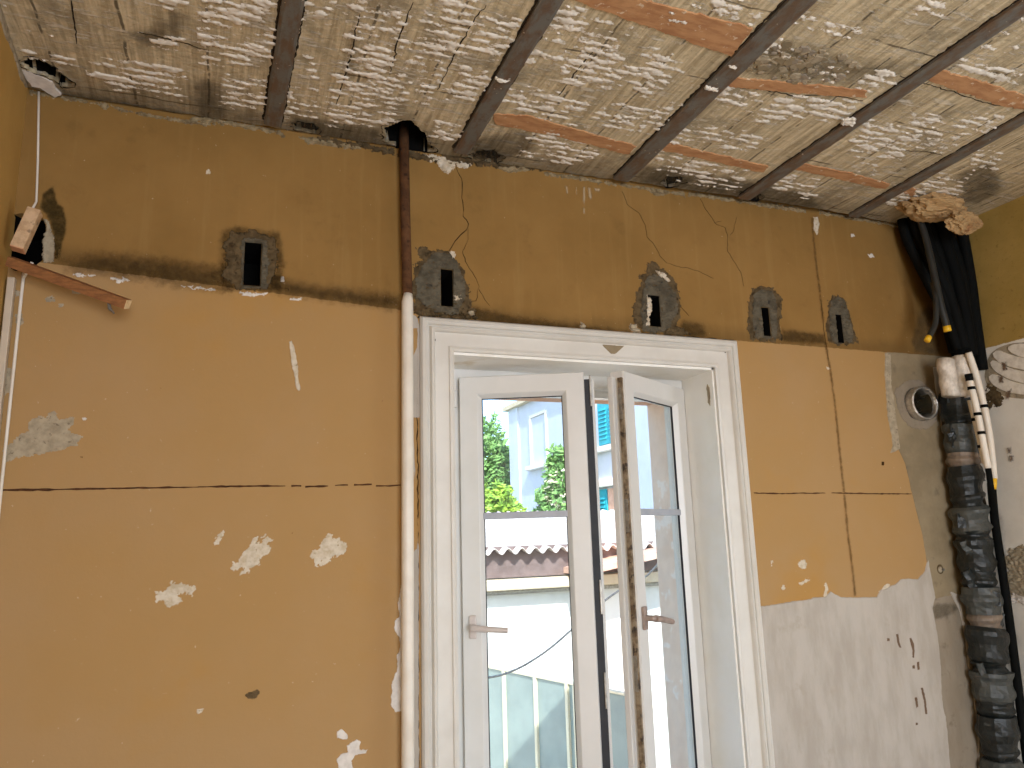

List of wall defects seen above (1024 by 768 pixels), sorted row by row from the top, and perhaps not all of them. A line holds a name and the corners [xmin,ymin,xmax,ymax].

water stain [42,188,66,259]
crack [418,167,505,323]
peeling [289,341,300,391]
peeling [2,411,87,462]
peeling [230,534,274,576]
peeling [310,533,347,567]
flaking render [761,352,984,768]
peeling [155,581,196,608]
peeling [336,729,368,768]